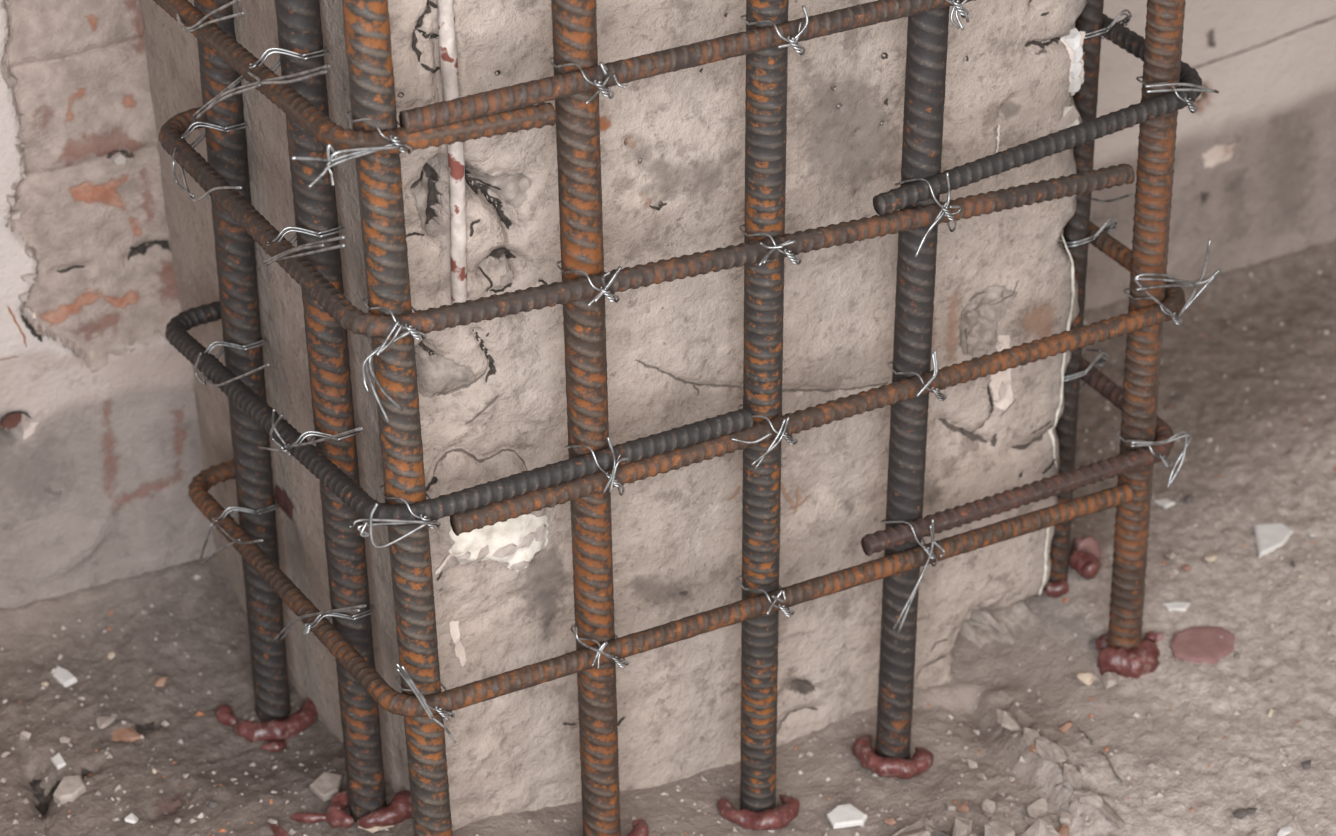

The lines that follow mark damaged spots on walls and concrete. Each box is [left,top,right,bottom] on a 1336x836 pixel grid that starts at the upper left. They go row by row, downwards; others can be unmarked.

flaking render [0,0,182,373]
crack [412,0,440,73]
spalling [538,89,604,285]
spalling [744,47,788,243]
spalling [901,6,950,186]
crack [474,332,496,382]
spalling [563,295,609,458]
spalling [892,225,938,382]
spalling [387,524,467,695]
peeling [449,513,549,572]
spalling [740,610,816,812]
spalling [875,567,920,759]